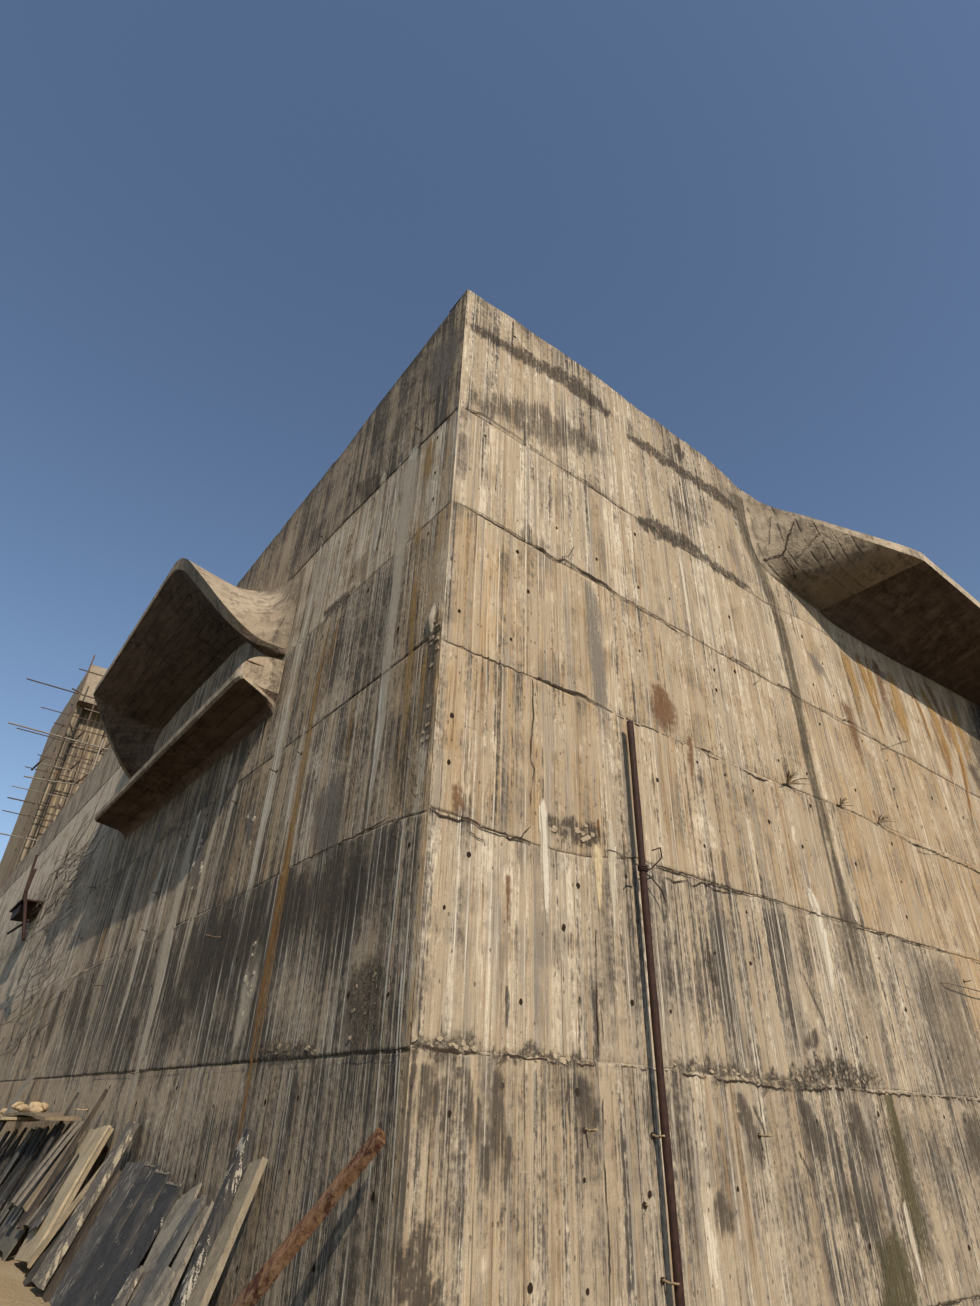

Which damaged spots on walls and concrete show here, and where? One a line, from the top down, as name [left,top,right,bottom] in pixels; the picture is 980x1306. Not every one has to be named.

water stain [431,322,611,454]
water stain [39,447,419,1108]
corrosion [653,685,677,728]
water stain [961,700,980,789]
corrosion [236,619,339,1146]